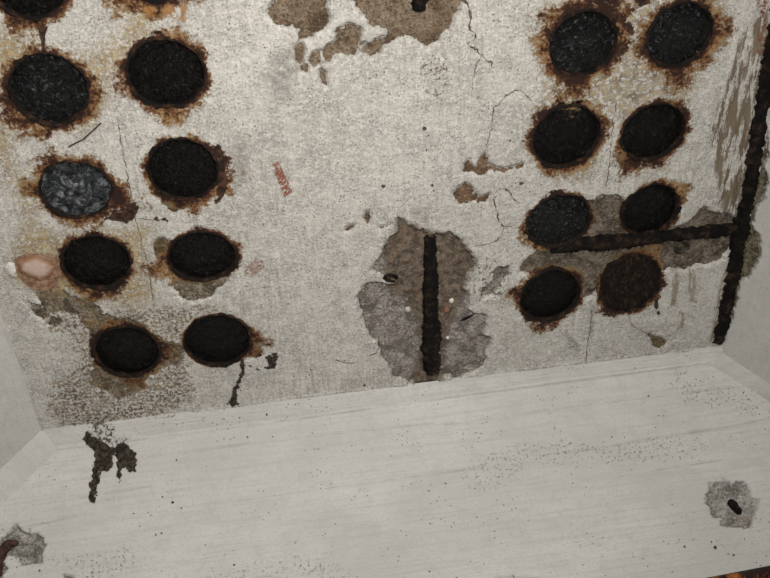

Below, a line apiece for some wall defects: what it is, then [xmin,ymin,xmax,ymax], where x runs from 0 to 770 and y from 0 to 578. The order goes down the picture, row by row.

spalling [268,0,462,85]
crack [462,0,493,93]
crack [484,89,532,152]
corrosion [522,0,745,234]
peeling [668,9,768,230]
corrosion [0,0,275,391]
crack [476,188,519,246]
corrosion [516,189,598,252]
corrosion [381,220,478,384]
spalling [357,218,731,383]
water stain [82,421,137,503]
spalling [707,482,757,528]